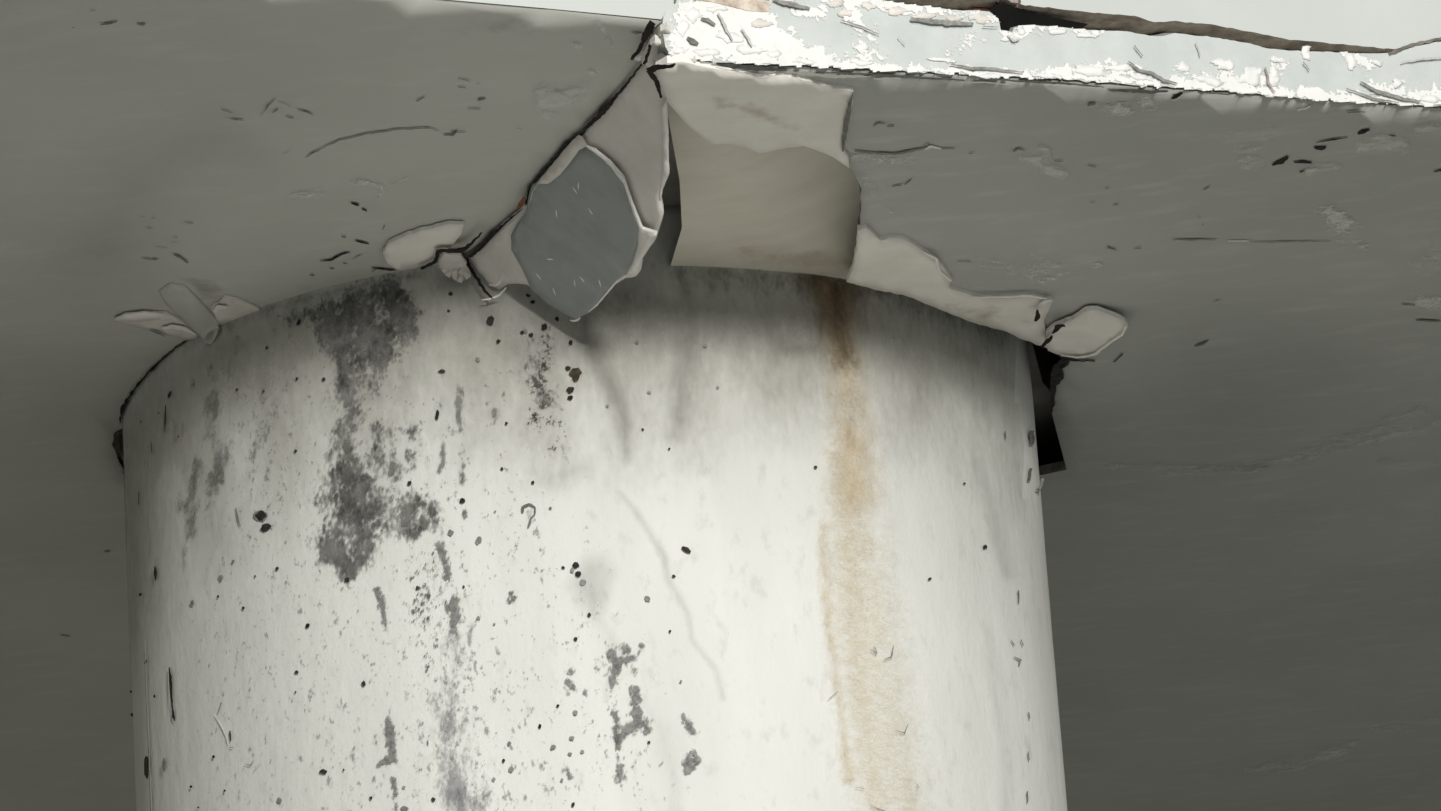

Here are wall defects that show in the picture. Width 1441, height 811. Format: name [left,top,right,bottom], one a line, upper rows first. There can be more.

crack [972,0,1111,31]
crack [1388,37,1441,55]
crack [283,127,462,158]
crack [310,0,677,299]
peeling [383,0,1441,359]
peeling [114,310,199,340]
peeling [211,294,260,325]
leakage [141,276,858,689]
corrosion [808,274,892,811]
leakage [376,715,398,808]
leakage [606,642,654,783]
leakage [682,713,701,774]